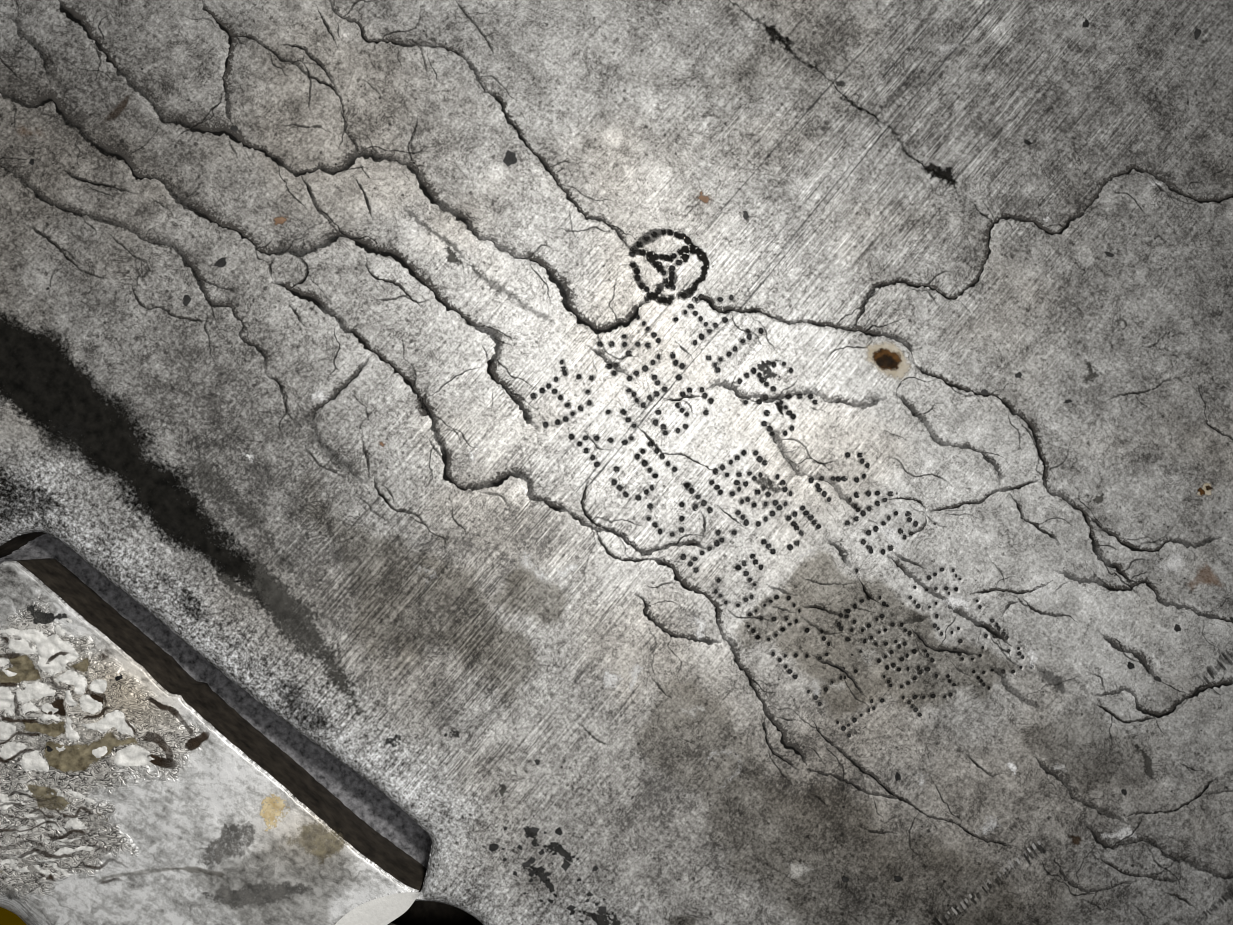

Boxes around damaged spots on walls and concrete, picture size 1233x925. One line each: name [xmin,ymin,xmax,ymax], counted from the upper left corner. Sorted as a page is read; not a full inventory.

rust [867,342,909,378]
crack [0,0,1008,846]
crack [665,163,1233,692]
water stain [0,467,61,529]
water stain [27,605,67,625]
water stain [162,574,211,622]
water stain [217,559,364,716]
water stain [946,595,969,610]
crack [1096,636,1233,732]
peeling [0,618,154,883]
peeling [489,826,622,925]
crack [1039,762,1233,906]